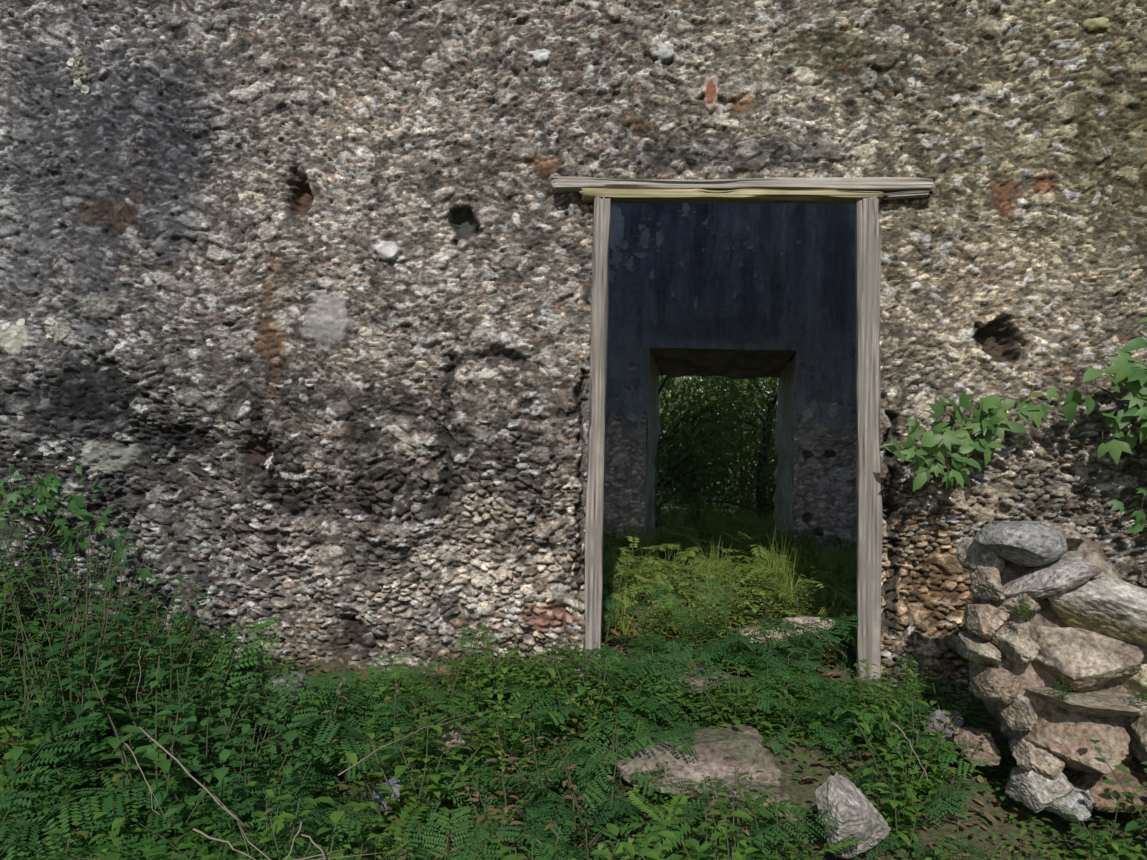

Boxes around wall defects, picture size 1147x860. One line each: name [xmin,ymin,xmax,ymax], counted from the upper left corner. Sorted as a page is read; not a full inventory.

flaking render [609,205,672,293]
spalling [603,412,647,554]
spalling [792,401,857,559]